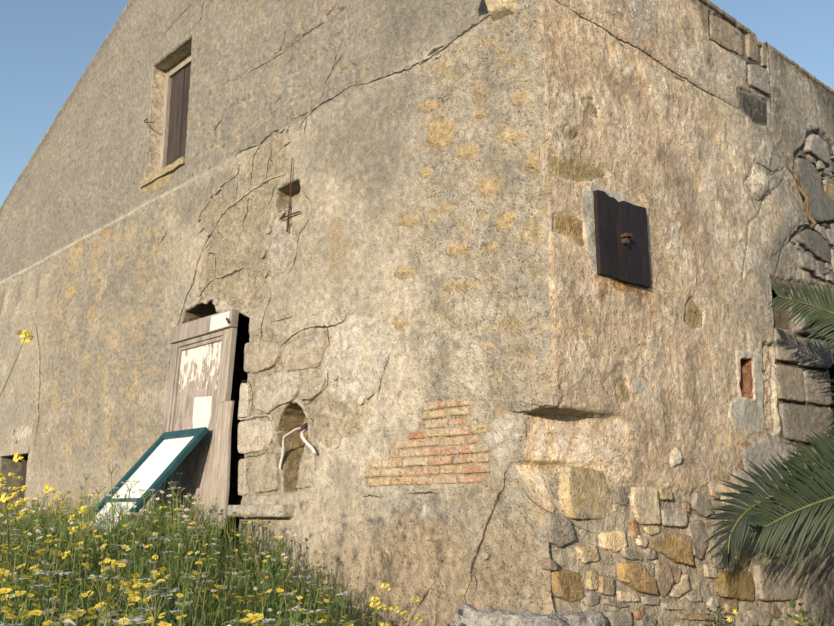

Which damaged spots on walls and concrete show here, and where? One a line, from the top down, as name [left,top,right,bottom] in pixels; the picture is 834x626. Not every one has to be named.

crack [557,1,772,124]
crack [796,76,831,157]
crack [176,4,490,326]
crack [742,162,784,276]
crack [772,222,830,278]
crack [244,294,348,353]
spalling [314,376,375,449]
flaking render [364,395,494,488]
crack [463,465,551,600]